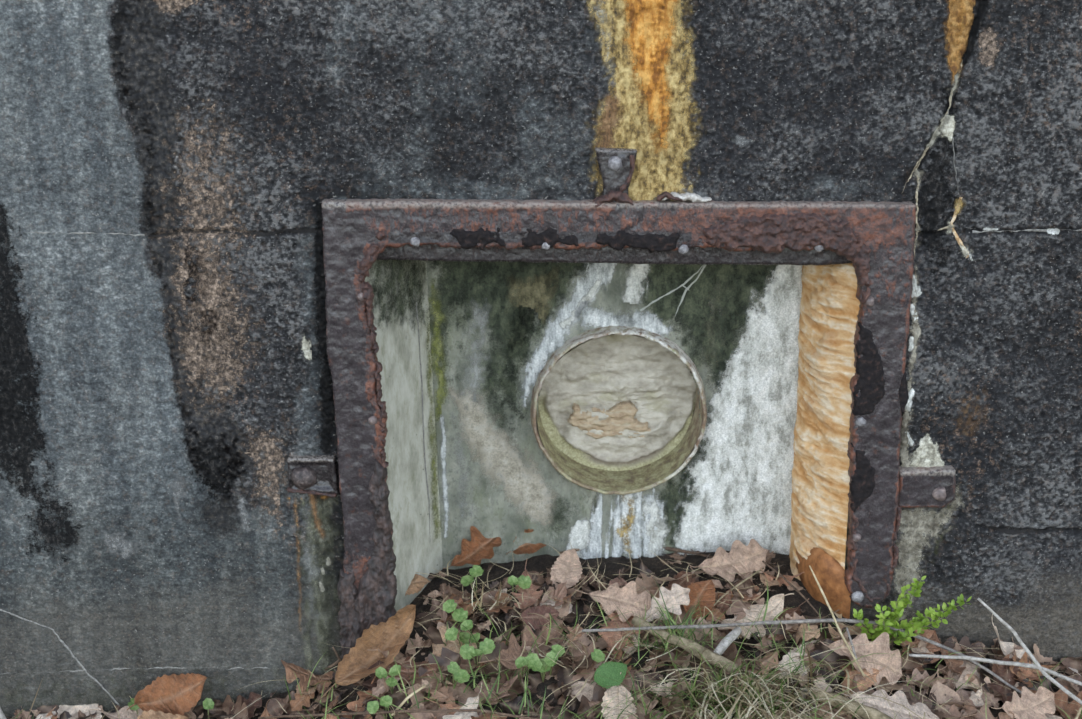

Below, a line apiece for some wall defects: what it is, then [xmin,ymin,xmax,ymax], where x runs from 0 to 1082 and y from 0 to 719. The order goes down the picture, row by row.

damp [0,204,81,562]
damp [108,0,253,535]
damp [314,203,335,454]
corrosion [337,231,397,659]
damp [370,260,803,559]
corrosion [588,0,701,207]
corrosion [703,213,871,304]
corrosion [945,0,989,82]
crack [903,62,1081,280]